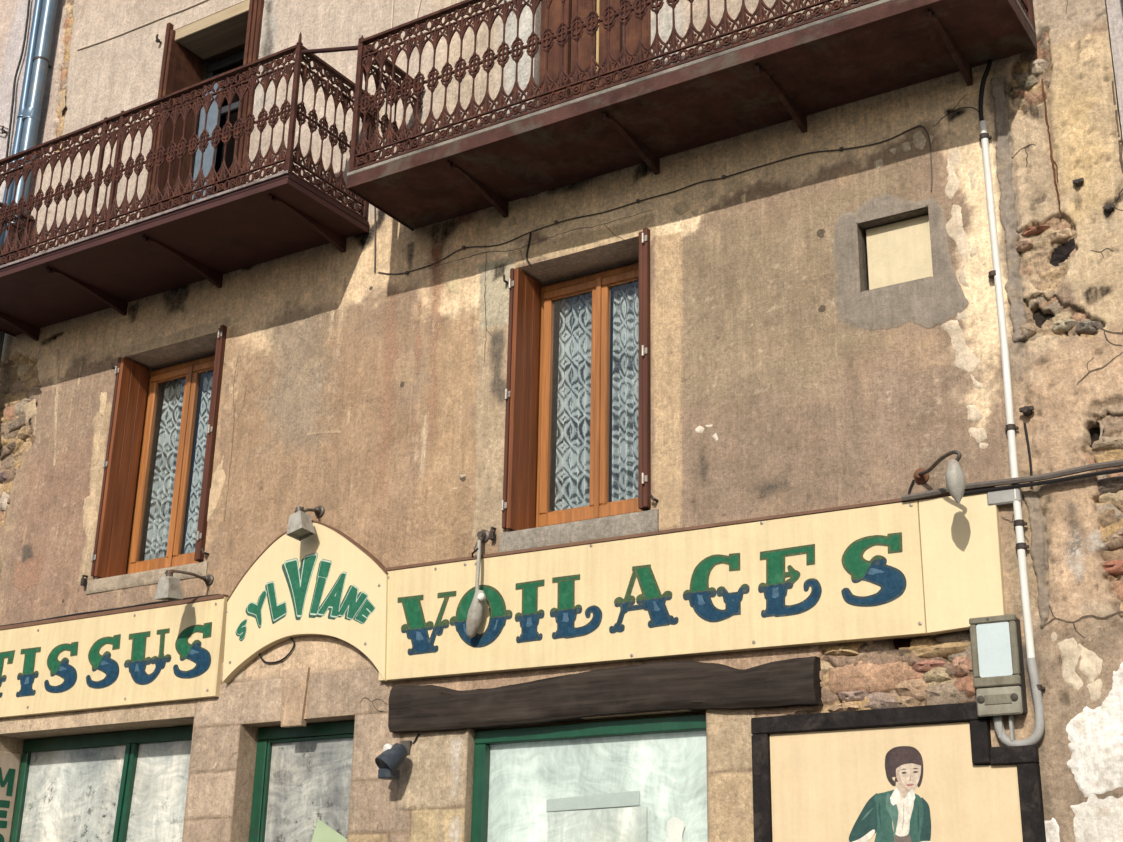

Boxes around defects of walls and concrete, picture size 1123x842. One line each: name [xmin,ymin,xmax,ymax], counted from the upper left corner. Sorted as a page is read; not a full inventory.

flaking render [1008,31,1052,114]
crack [1011,78,1061,214]
crack [1102,81,1123,211]
flaking render [945,147,977,288]
flaking render [1015,216,1105,343]
water stain [491,333,504,399]
crack [1077,321,1123,385]
flaking render [0,355,41,527]
flaking render [1084,412,1123,618]
flaking render [794,630,978,715]
peeling [1051,632,1123,842]
peeling [1045,818,1060,842]